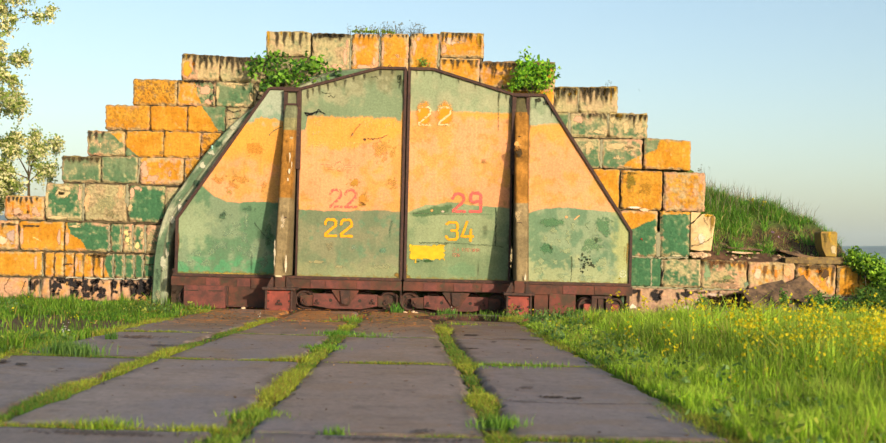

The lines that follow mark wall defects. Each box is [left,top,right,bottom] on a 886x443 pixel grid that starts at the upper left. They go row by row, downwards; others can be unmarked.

water stain [267,31,482,48]
water stain [182,54,261,72]
water stain [440,59,553,78]
water stain [557,87,616,102]
water stain [581,113,647,123]
water stain [29,269,160,302]